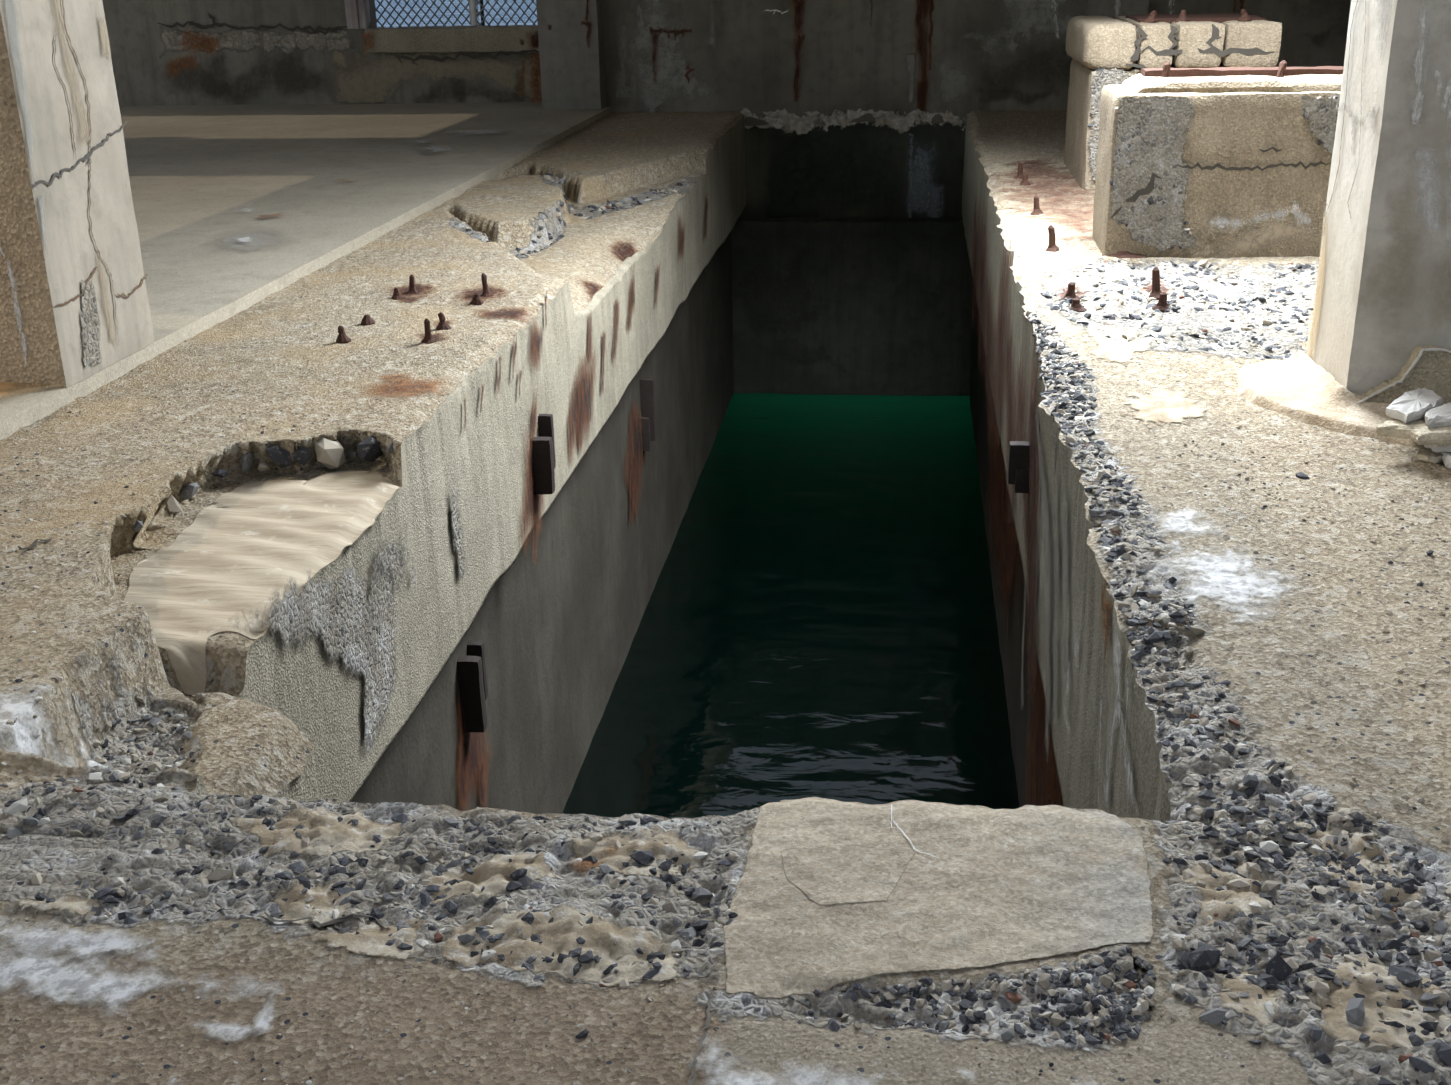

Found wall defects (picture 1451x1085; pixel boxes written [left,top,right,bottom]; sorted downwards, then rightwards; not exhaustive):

crack [28,0,148,343]
crack [157,13,347,35]
rust [916,0,934,111]
rust [990,158,1095,240]
crack [1111,0,1366,249]
water stain [1409,11,1451,125]
rust [391,283,432,302]
spalling [0,107,966,990]
rust [971,203,1064,807]
spalling [694,94,1451,1085]
water stain [0,921,175,1011]
water stain [195,980,274,1041]